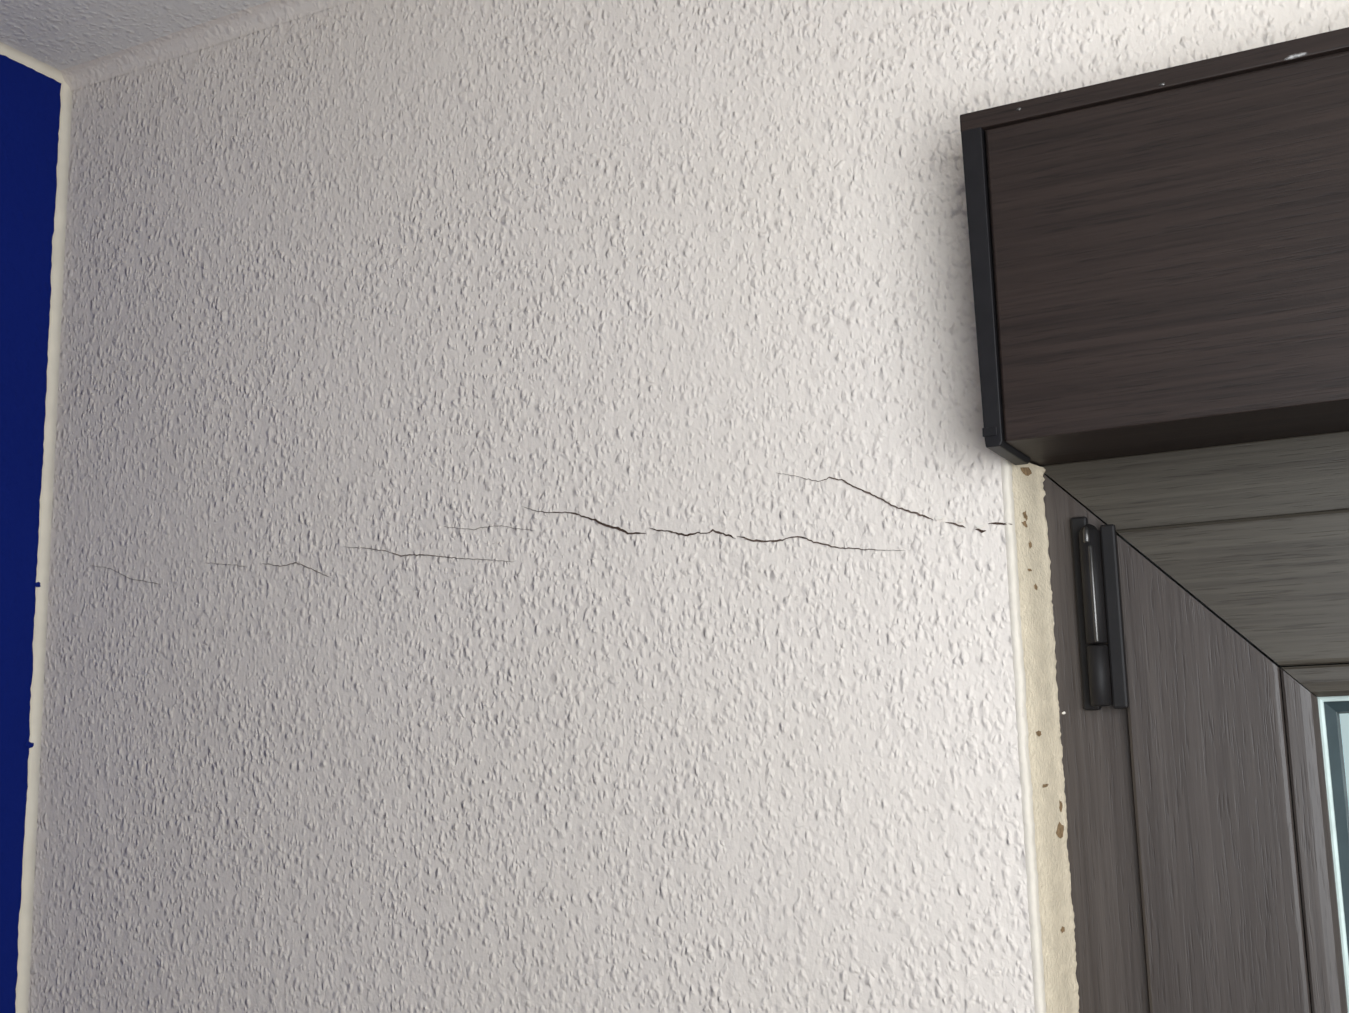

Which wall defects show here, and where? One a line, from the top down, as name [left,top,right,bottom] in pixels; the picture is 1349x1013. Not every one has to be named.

crack [778,473,1012,533]
crack [348,507,902,562]